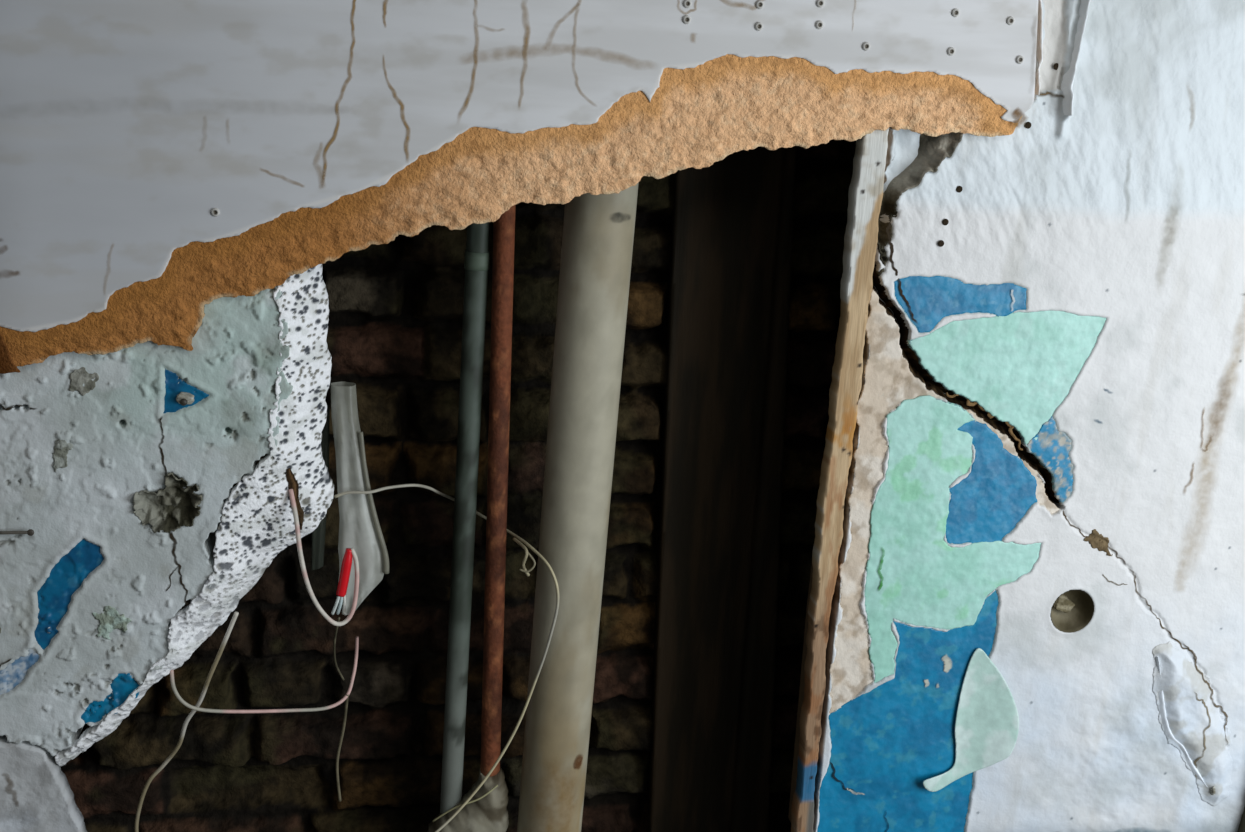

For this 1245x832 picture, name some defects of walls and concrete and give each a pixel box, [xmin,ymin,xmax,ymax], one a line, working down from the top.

peeling [0,539,104,695]
crack [159,417,167,474]
crack [166,533,188,604]
spalling [52,264,334,766]
peeling [817,132,1106,832]
crack [872,222,1228,777]